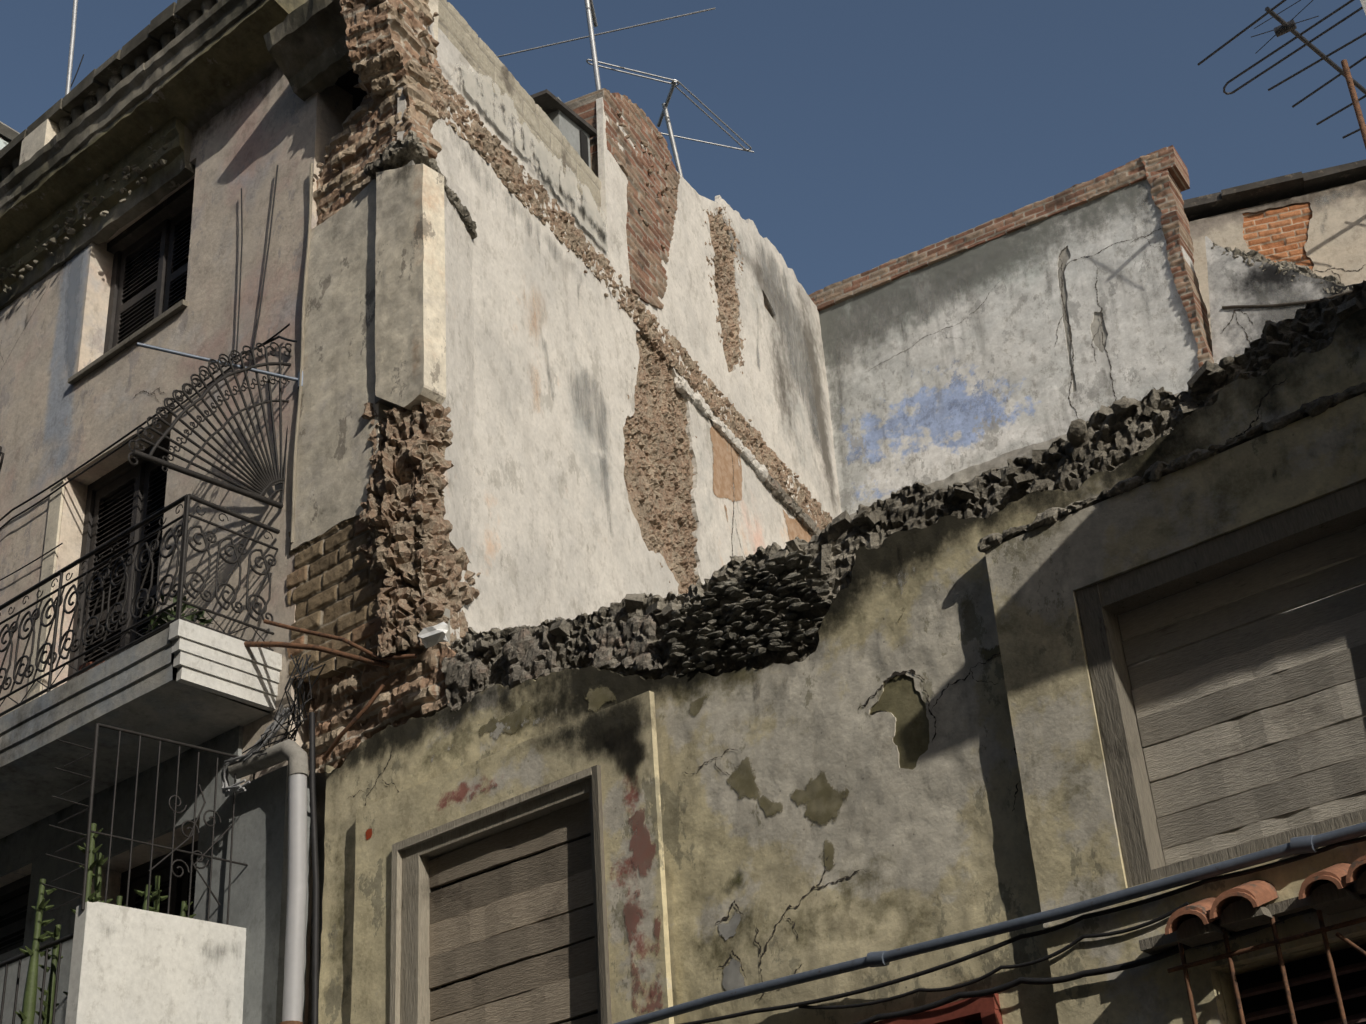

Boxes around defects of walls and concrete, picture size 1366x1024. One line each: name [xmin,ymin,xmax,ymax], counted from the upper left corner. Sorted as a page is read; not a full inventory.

spalling [308,0,497,226]
spalling [703,207,746,374]
spalling [604,266,882,622]
crack [1054,228,1161,418]
spalling [1177,361,1215,419]
crack [1223,308,1253,342]
flaking render [1238,203,1314,272]
flaking render [286,516,388,684]
water stain [604,725,645,782]
peeling [727,757,849,870]
peeling [858,669,936,770]
crack [754,856,872,1000]